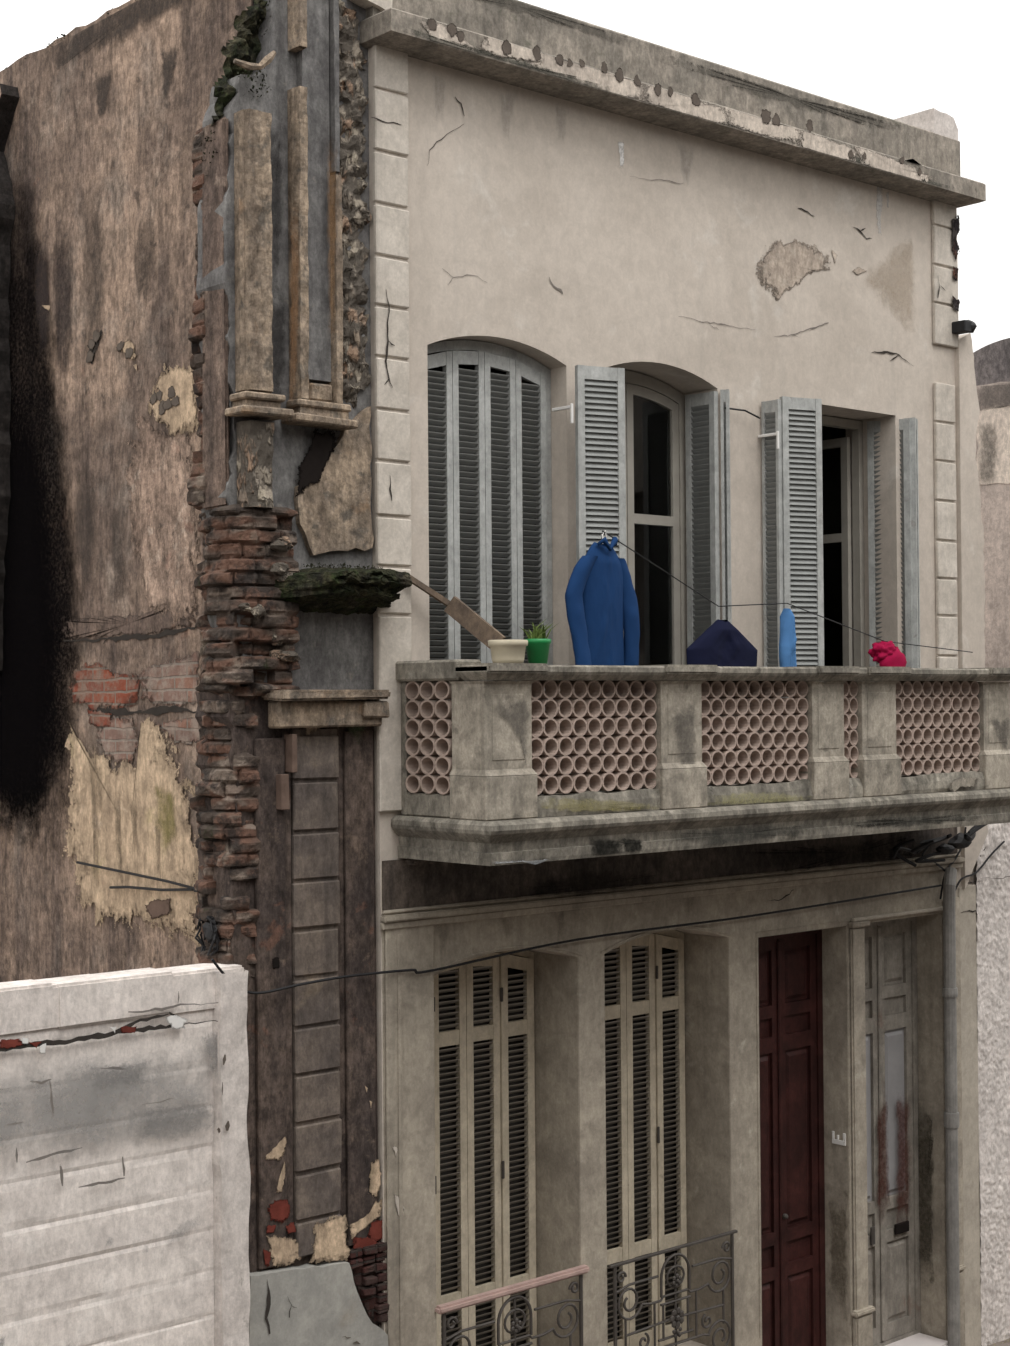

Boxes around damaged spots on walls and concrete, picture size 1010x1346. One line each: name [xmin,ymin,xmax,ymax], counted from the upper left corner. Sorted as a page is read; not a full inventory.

spalling [192,127,205,209]
peeling [420,18,936,182]
peeling [756,238,837,300]
spalling [60,233,337,978]
spalling [263,1137,405,1327]